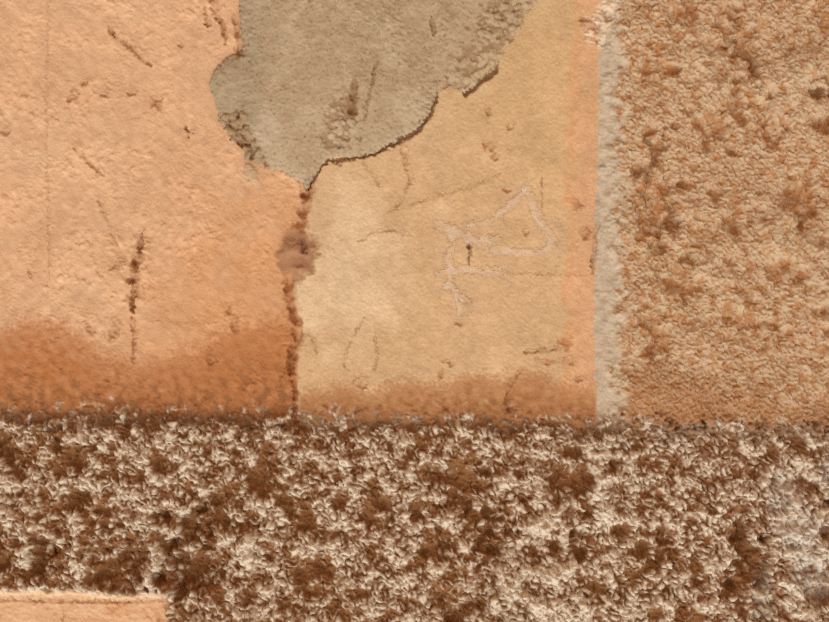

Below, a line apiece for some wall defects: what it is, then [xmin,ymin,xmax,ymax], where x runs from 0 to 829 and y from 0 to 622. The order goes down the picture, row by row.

spalling [218,109,271,170]
crack [292,97,501,242]
crack [278,278,317,428]